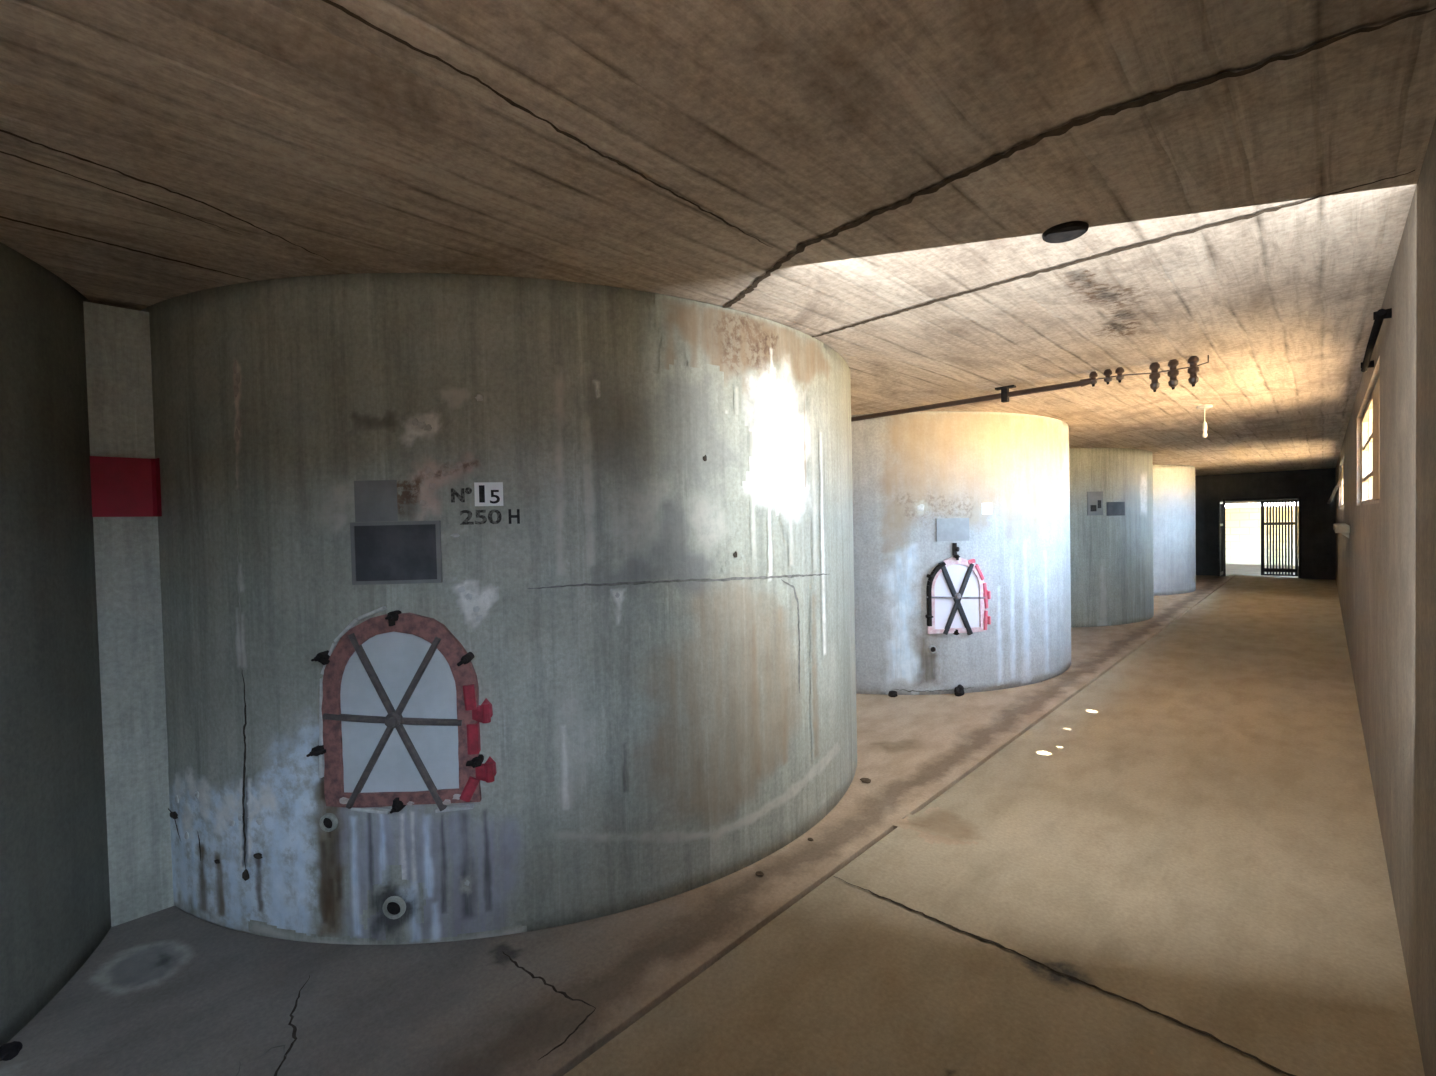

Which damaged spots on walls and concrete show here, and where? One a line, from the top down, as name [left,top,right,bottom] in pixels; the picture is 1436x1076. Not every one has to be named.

crack [322,0,1436,308]
water stain [870,412,1068,694]
water stain [168,294,841,945]
water stain [865,737,934,756]
water stain [885,805,993,845]
corrosion [195,840,228,920]
corrosion [252,851,266,914]
water stain [83,935,202,1001]
crack [236,975,310,1076]
crack [481,938,596,1060]
crack [834,876,1296,1076]